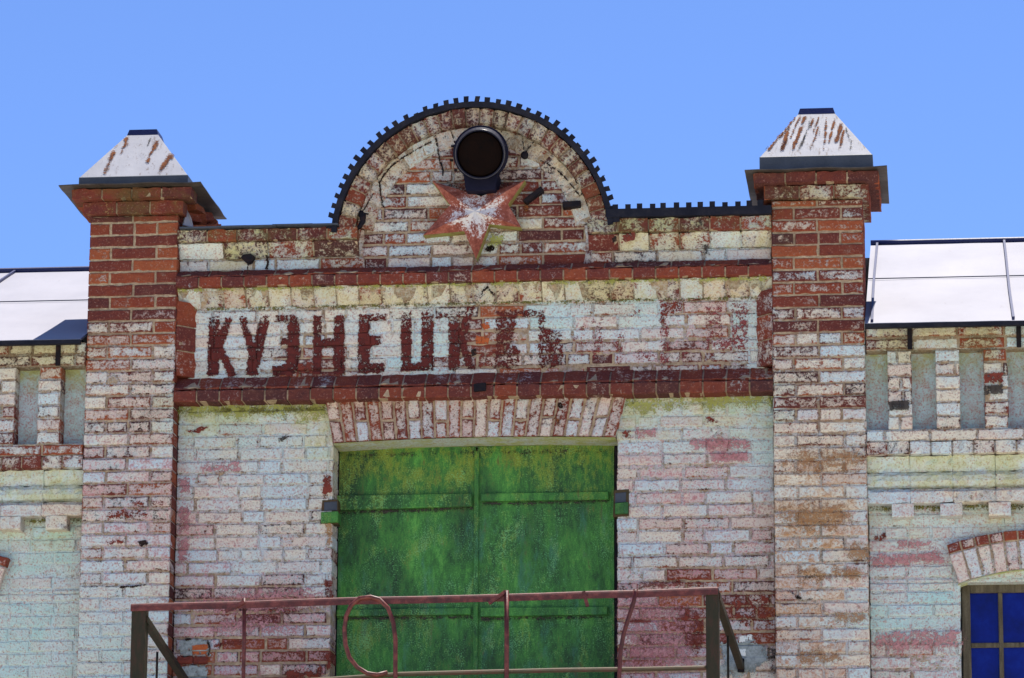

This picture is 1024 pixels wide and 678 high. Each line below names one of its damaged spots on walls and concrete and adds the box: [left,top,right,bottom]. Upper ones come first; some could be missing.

corrosion [766,116,852,151]
corrosion [146,138,174,172]
crack [363,131,455,211]
spalling [485,233,504,253]
peeling [660,301,680,330]
peeling [618,578,708,678]